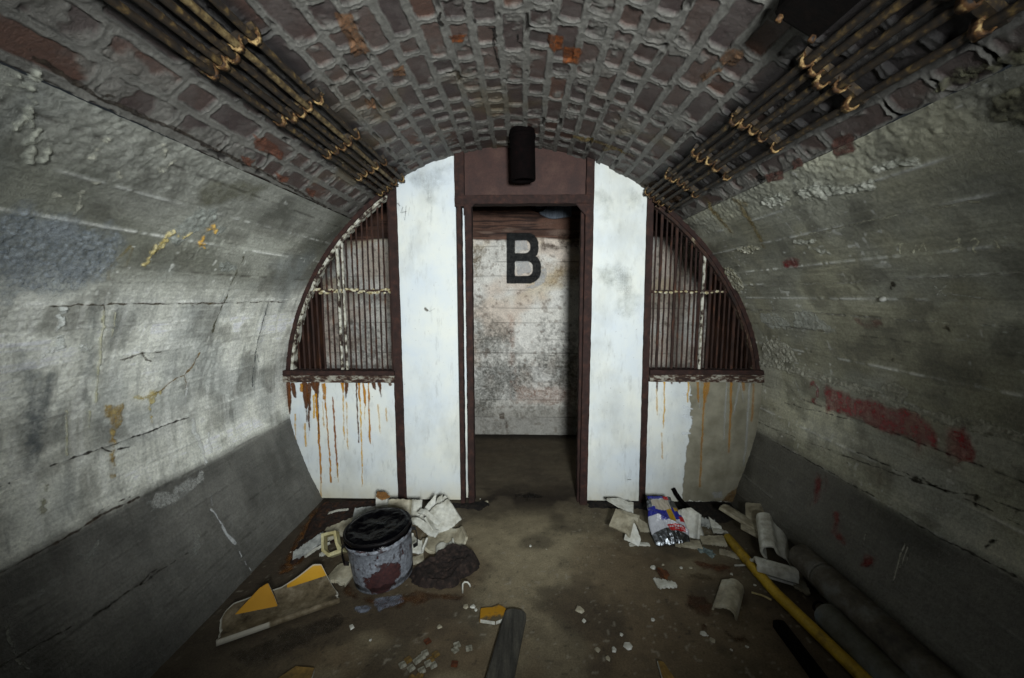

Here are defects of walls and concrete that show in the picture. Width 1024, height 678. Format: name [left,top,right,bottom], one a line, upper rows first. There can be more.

peeling [9,70,42,92]
peeling [13,107,53,165]
flaking render [756,158,803,183]
flaking render [832,134,855,158]
crack [53,256,282,397]
crack [51,418,188,466]
corrosion [286,382,391,484]
corrosion [656,382,709,458]